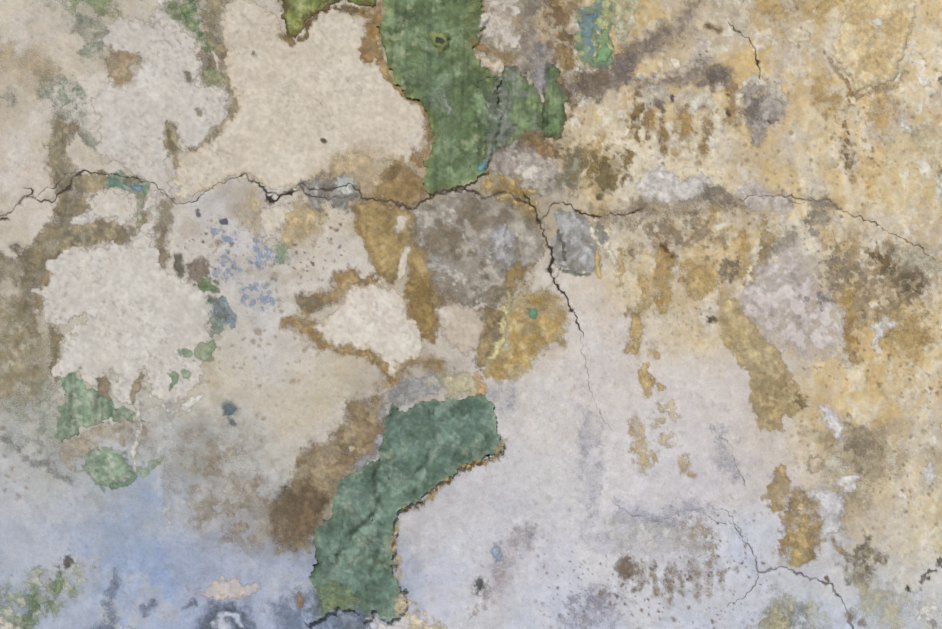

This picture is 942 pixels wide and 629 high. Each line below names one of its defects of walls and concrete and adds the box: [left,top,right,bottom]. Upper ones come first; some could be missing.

peeling [30,0,521,405]
crack [0,158,641,424]
crack [739,194,936,261]
peeling [306,393,505,629]
crack [613,502,854,629]
crack [920,557,942,589]